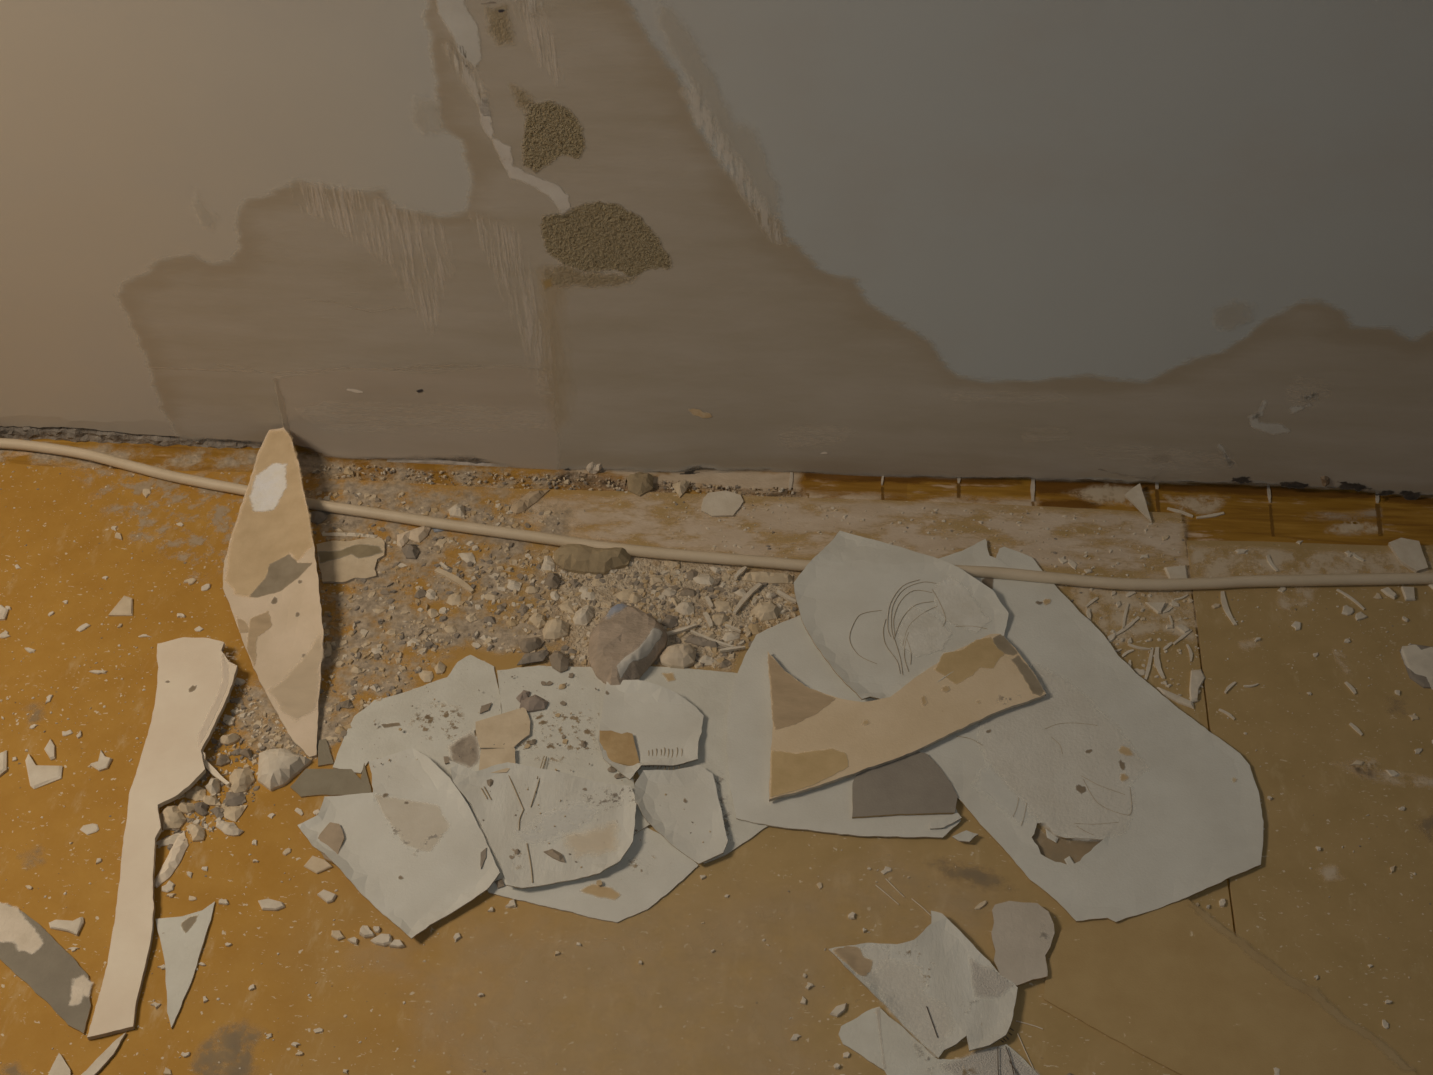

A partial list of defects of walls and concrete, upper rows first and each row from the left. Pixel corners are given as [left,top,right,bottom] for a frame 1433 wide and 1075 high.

flaking render [0,0,1433,500]
flaking render [701,491,744,517]